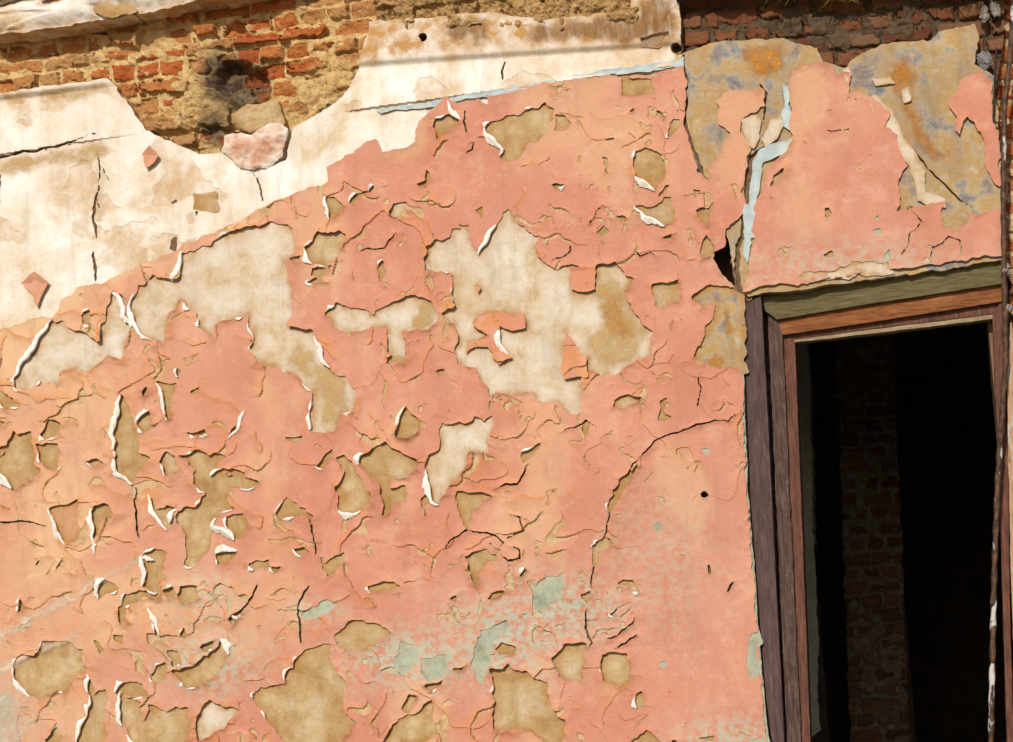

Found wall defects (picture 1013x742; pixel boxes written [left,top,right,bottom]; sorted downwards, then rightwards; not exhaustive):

crack [0,123,115,284]
peeling [0,0,1013,532]
crack [813,123,874,137]
crack [895,127,980,265]
peeling [8,363,652,742]
peeling [740,628,763,688]
peeling [624,725,723,742]
peeling [739,730,767,742]